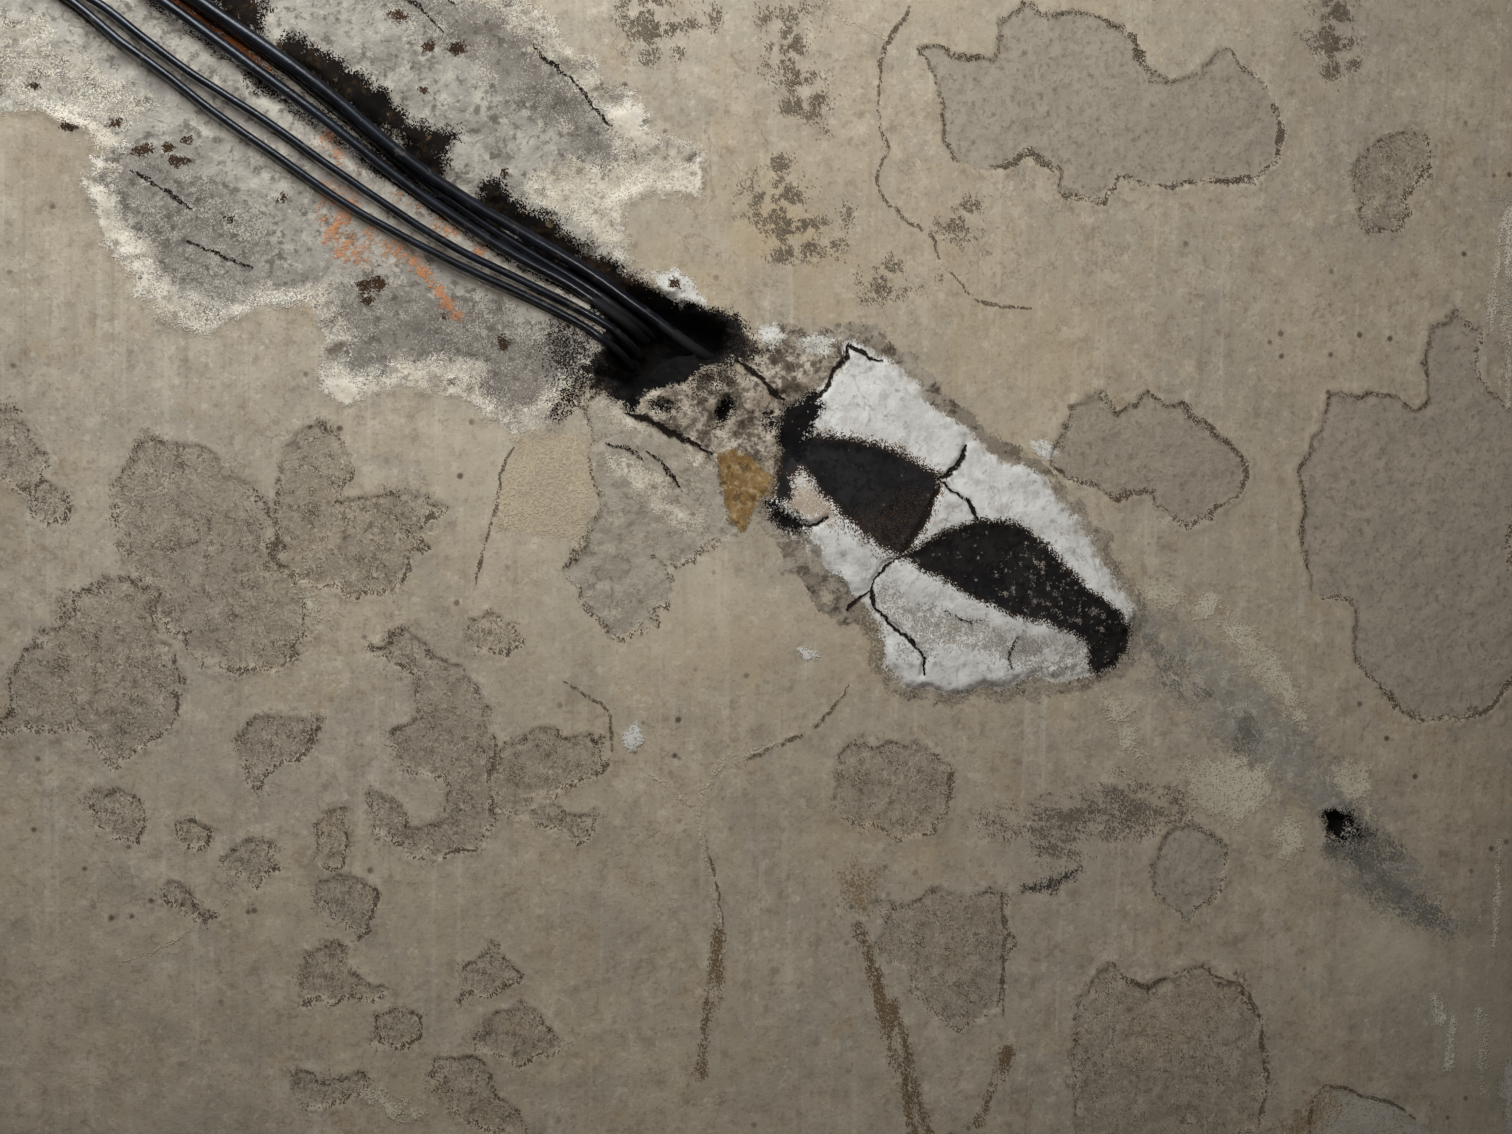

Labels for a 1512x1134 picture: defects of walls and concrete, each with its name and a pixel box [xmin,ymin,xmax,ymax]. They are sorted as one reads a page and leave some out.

crack [825,0,1032,309]
peeling [1343,123,1436,240]
flaking render [0,0,1315,766]
crack [728,343,883,402]
crack [605,413,713,492]
crack [804,516,829,528]
crack [845,444,979,675]
crack [1007,636,1019,670]